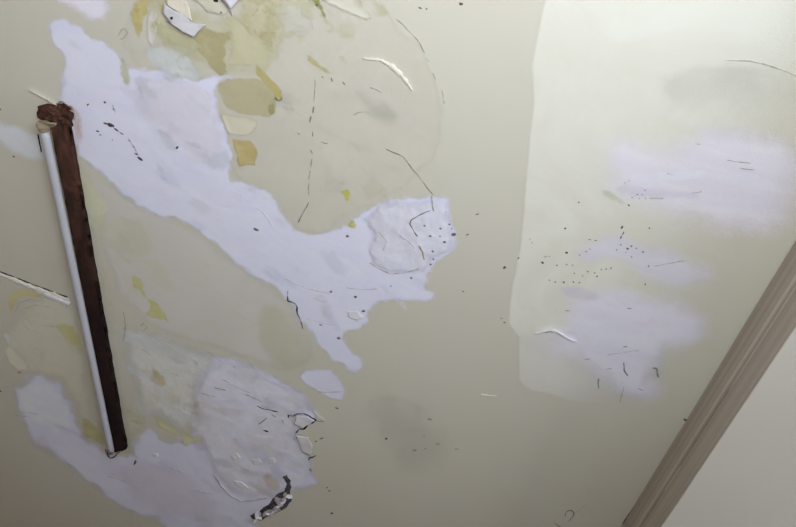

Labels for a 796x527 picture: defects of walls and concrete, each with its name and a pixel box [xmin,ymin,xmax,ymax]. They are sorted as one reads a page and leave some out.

peeling [162,0,238,38]
peeling [221,113,259,136]
crack [0,271,70,307]
rust [36,101,128,459]
spalling [250,475,293,523]